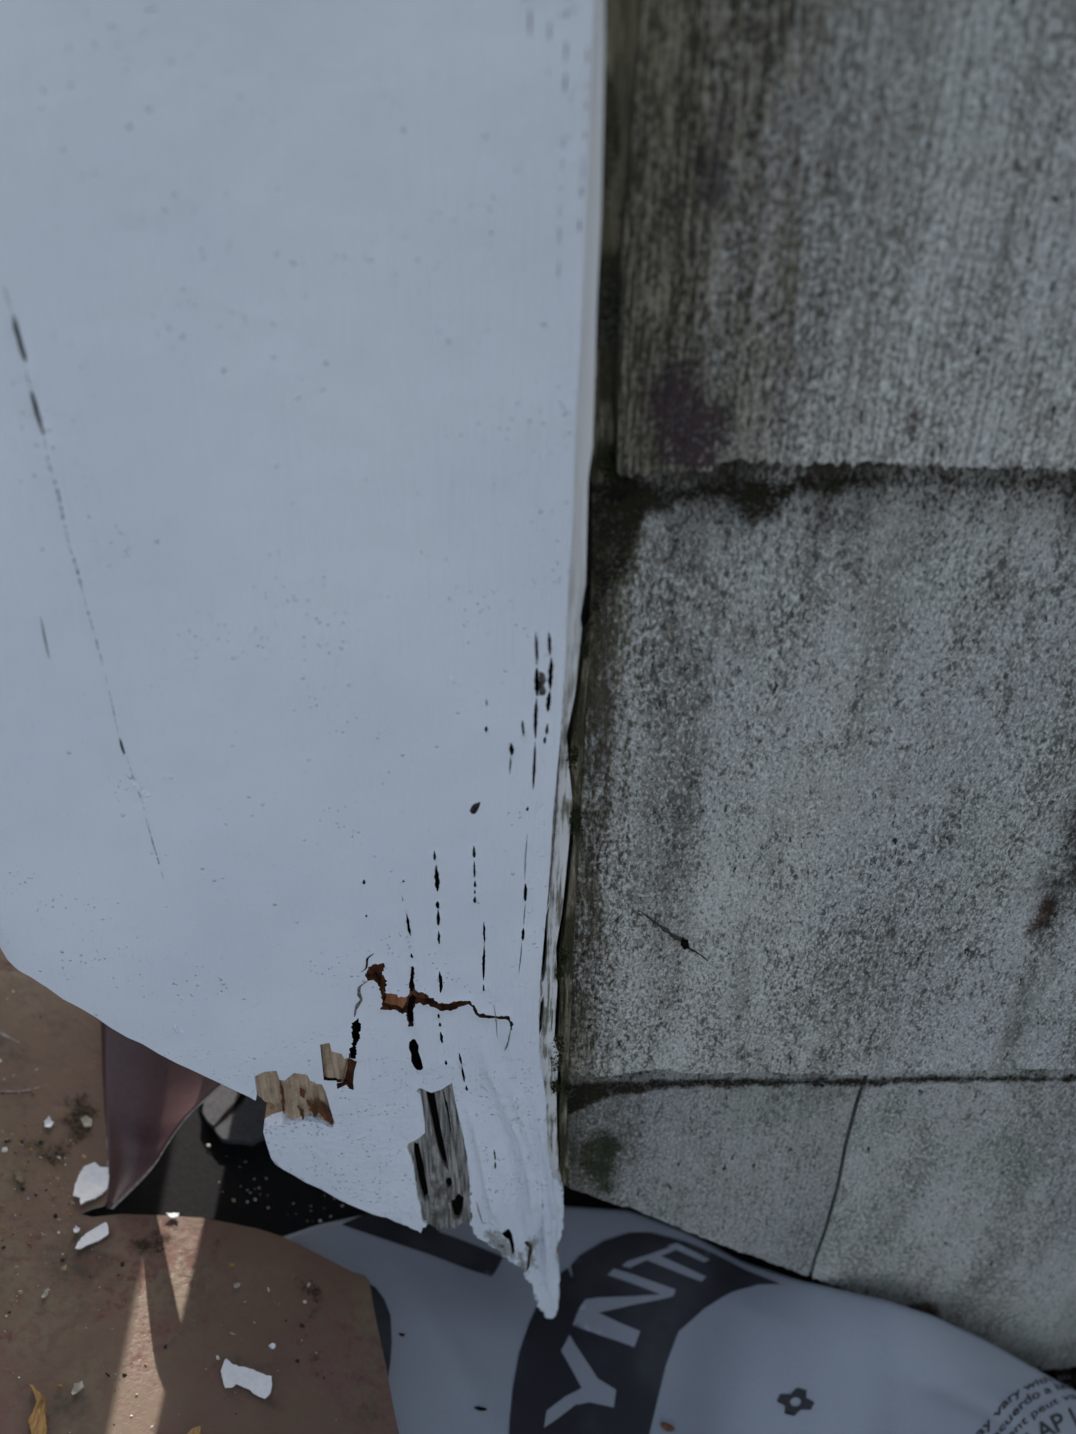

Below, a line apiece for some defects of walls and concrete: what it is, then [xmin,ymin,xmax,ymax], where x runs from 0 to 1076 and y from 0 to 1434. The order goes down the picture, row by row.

crack [509,632,564,970]
damp [1037,804,1076,950]
crack [354,954,373,1017]
crack [402,846,511,1115]
spalling [502,1229,533,1272]